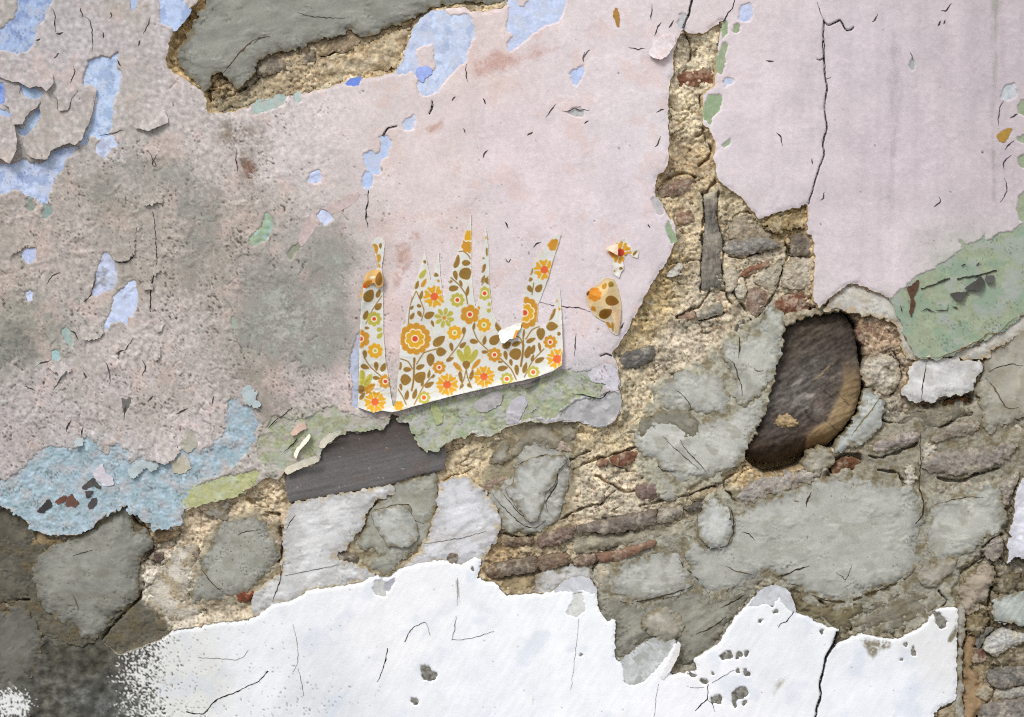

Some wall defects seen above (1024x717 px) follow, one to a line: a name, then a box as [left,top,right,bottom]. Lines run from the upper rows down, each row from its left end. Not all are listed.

peeling [0,0,122,219]
peeling [159,0,192,31]
peeling [396,9,475,96]
peeling [506,0,566,52]
peeling [649,13,688,60]
peeling [702,3,753,125]
crack [808,2,878,204]
peeling [889,192,1024,361]
peeling [0,333,622,536]
spalling [932,610,947,629]
crack [186,671,269,714]
crack [815,631,839,717]